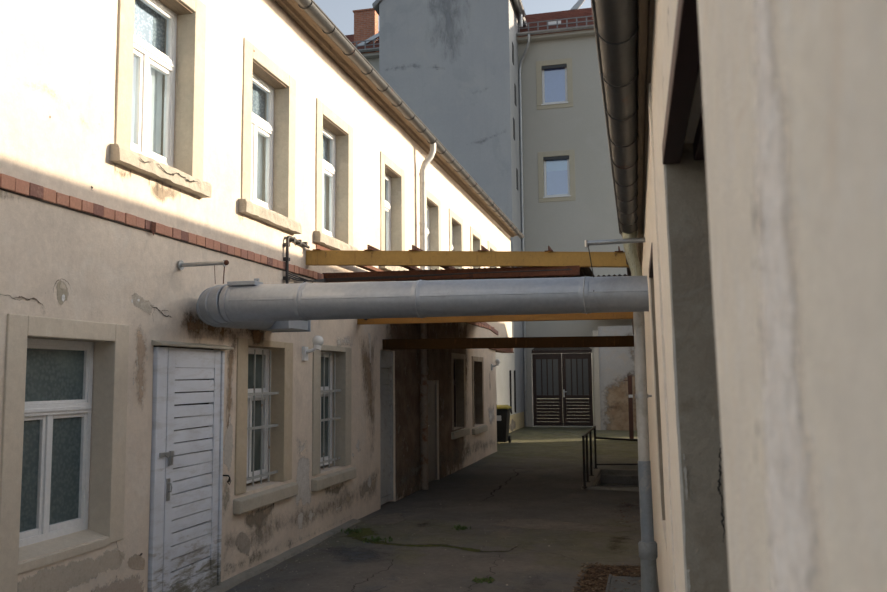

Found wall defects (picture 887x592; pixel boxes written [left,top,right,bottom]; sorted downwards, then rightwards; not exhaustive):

crack [140,158,198,183]
crack [717,439,725,543]
peeling [91,553,145,592]
crack [351,537,574,592]